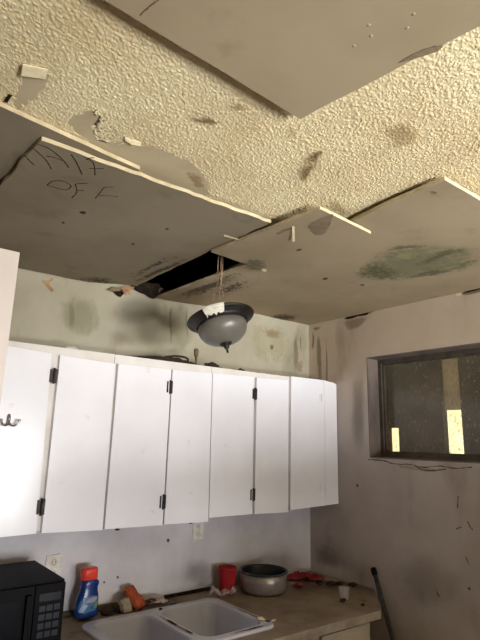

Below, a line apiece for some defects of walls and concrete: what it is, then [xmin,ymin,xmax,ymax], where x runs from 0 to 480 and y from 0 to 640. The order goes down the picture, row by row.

peeling [4,64,48,110]
crack [368,459,472,472]